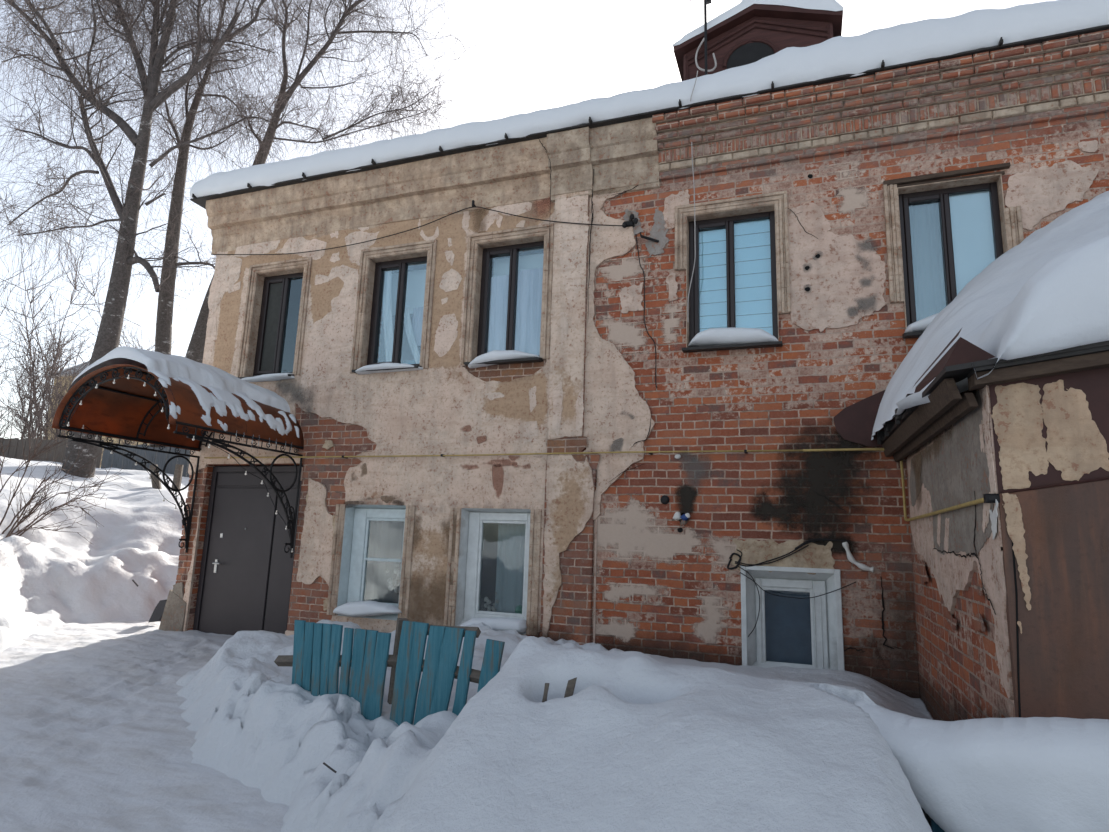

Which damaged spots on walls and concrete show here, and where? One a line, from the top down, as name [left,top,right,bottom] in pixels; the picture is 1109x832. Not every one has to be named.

peeling [204,227,380,392]
peeling [558,196,590,346]
peeling [784,203,886,332]
flaking render [287,404,403,631]
water stain [592,580,669,604]
water stain [592,607,725,663]
water stain [593,454,740,573]
water stain [693,586,730,644]
peeling [731,538,835,575]
water stain [751,427,872,553]
crack [844,577,902,652]
peeling [979,380,1109,611]